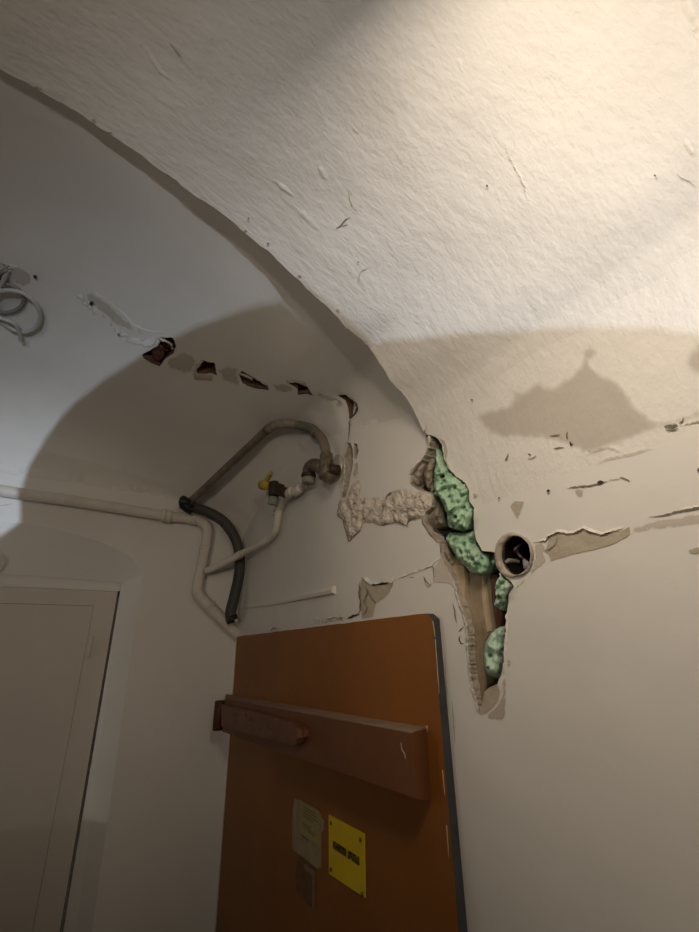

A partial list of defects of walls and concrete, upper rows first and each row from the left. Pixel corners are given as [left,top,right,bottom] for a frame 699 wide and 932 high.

spalling [142,337,176,367]
spalling [193,360,217,381]
spalling [238,371,268,389]
spalling [286,379,312,395]
spalling [338,395,358,419]
flaking render [532,505,699,572]
flaking render [337,435,524,714]